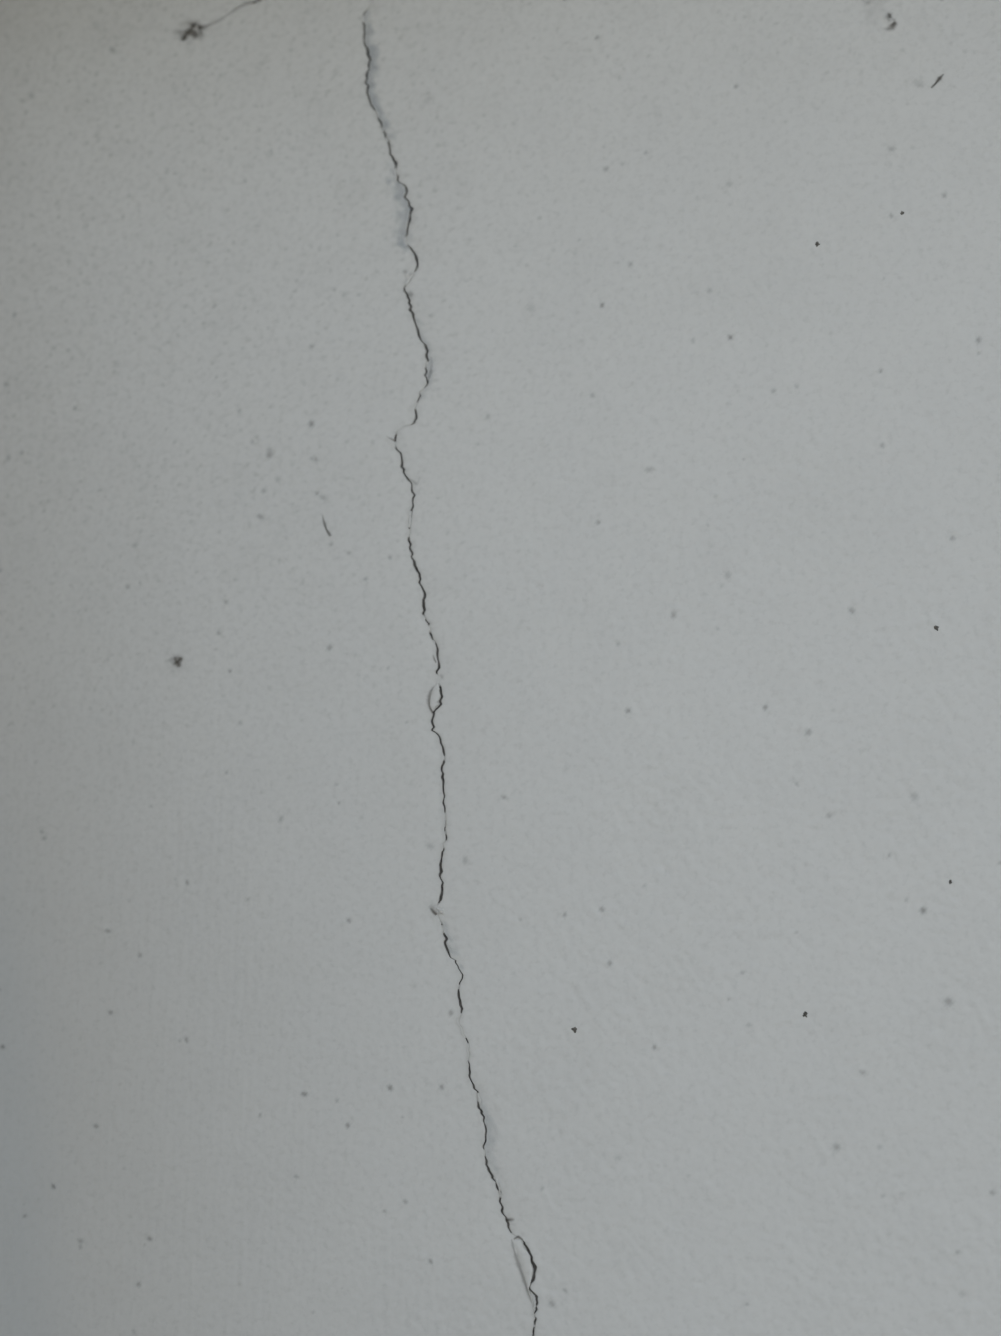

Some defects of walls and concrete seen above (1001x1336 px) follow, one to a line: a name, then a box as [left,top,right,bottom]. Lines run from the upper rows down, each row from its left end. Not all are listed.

crack [181,23,202,41]
crack [363,10,538,1336]